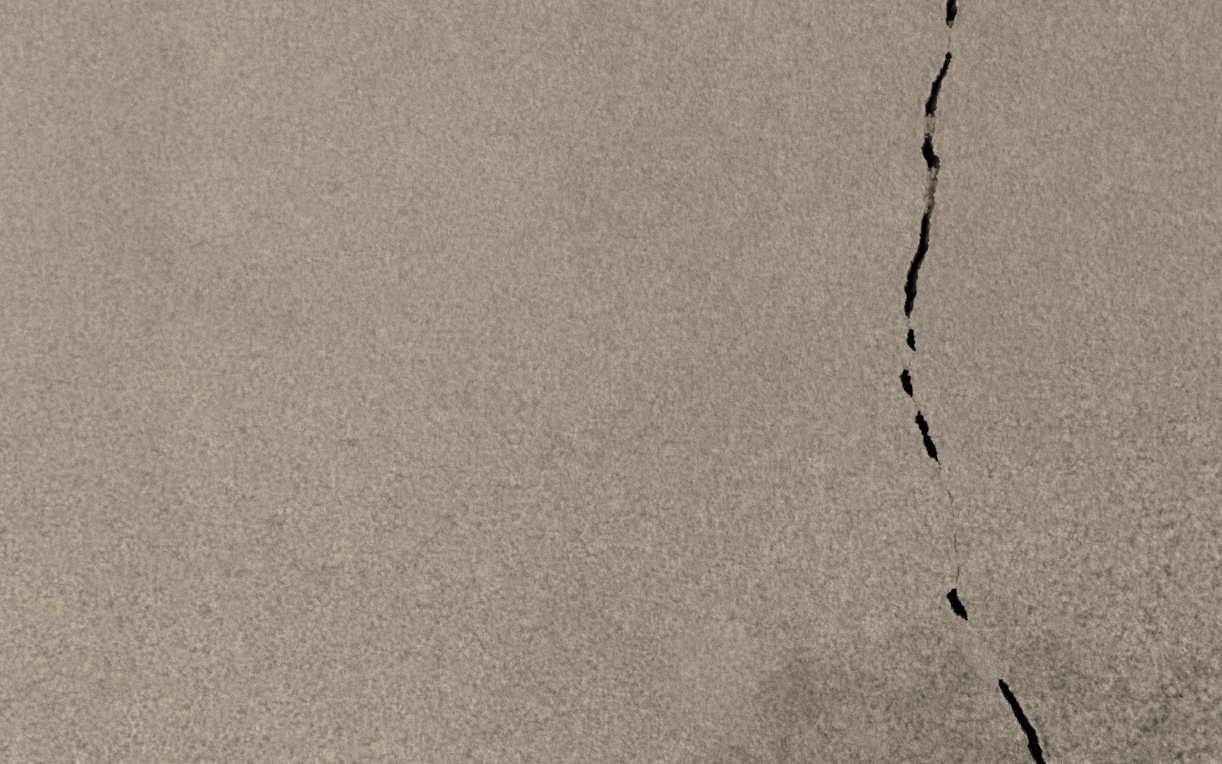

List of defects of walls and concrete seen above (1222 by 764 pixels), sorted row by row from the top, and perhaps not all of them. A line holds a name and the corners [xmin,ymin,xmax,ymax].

crack [899,0,1046,764]